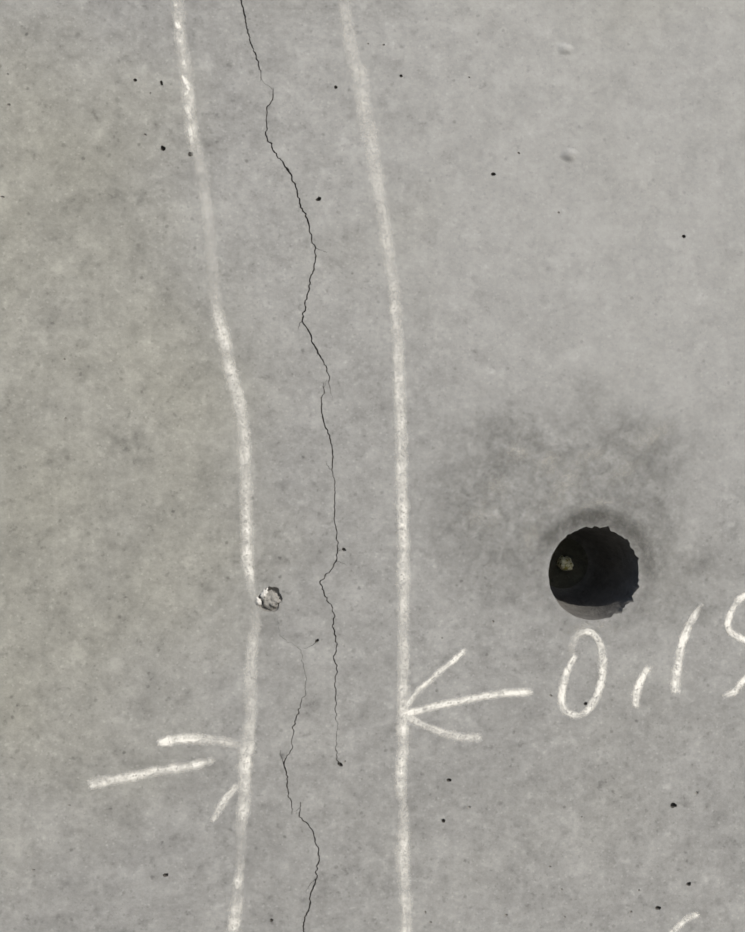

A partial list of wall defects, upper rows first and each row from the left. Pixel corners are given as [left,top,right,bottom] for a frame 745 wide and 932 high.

crack [240,0,347,932]